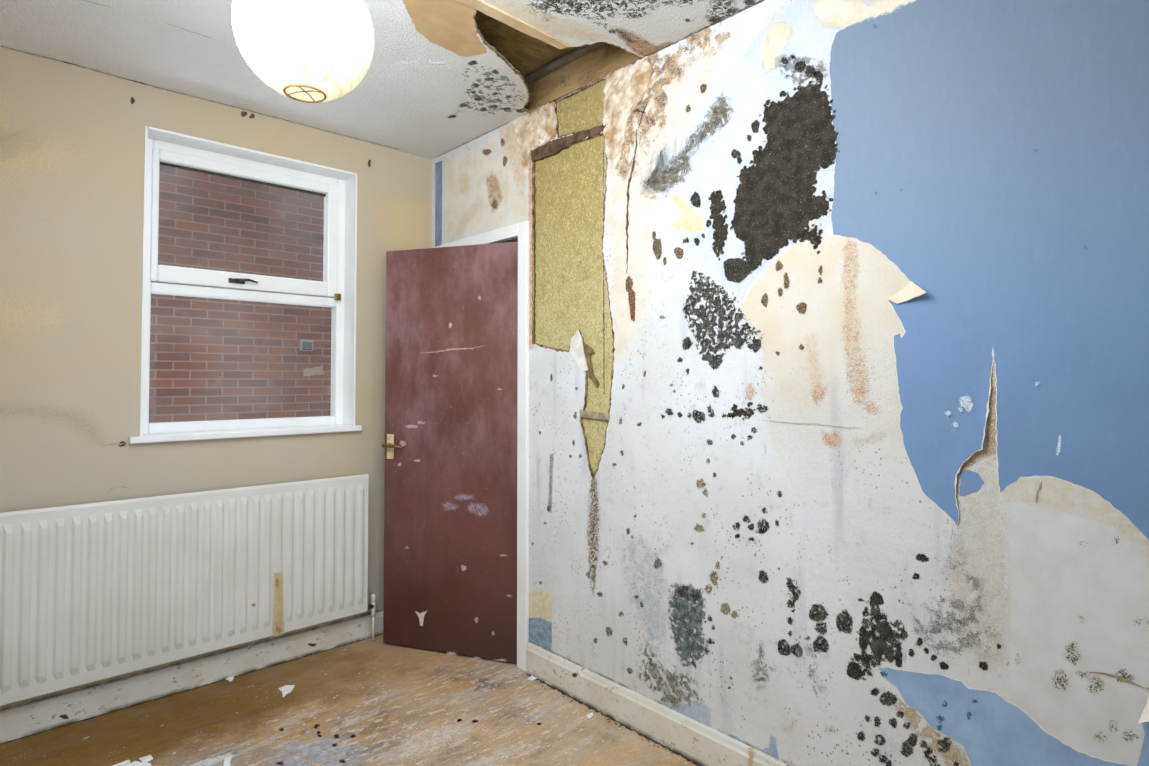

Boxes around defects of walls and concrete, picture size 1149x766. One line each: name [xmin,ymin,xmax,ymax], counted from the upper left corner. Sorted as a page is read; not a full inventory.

water stain [370,60,535,257]
water stain [484,0,839,375]
flaking render [473,9,654,595]
water stain [696,439,717,496]
water stain [661,386,768,446]
water stain [593,513,739,713]
water stain [747,553,1001,766]